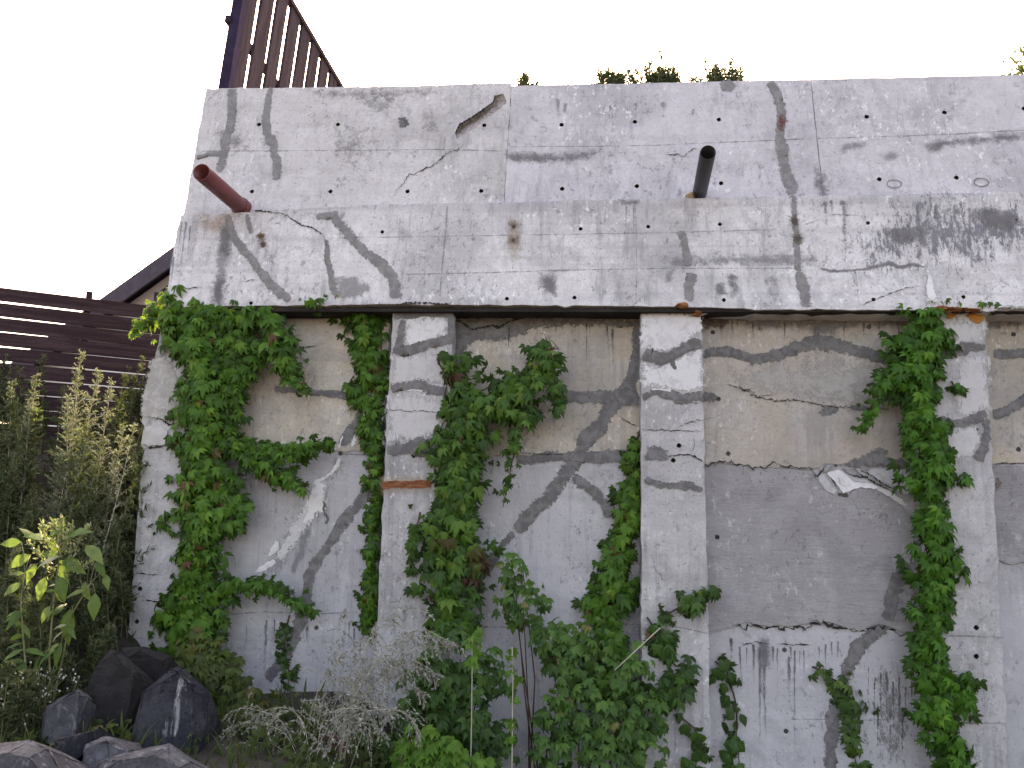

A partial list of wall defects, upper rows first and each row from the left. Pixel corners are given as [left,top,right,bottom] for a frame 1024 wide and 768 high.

spalling [455,94,507,139]
damp [815,173,845,232]
damp [672,190,1024,294]
crack [225,79,906,582]
rust [947,314,985,323]
rust [382,479,431,490]
peeling [812,464,919,513]
damp [730,638,804,709]
crack [733,561,911,768]